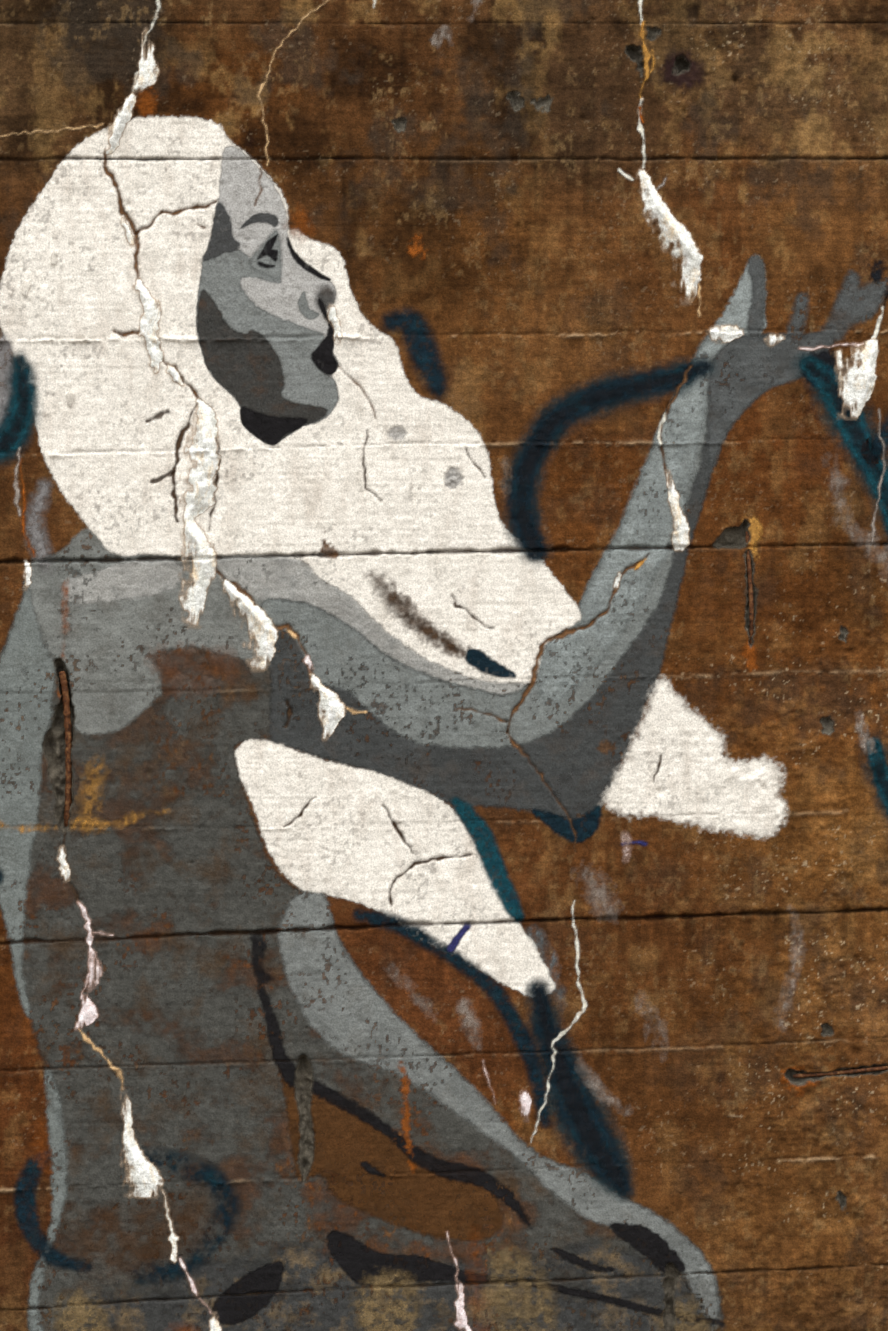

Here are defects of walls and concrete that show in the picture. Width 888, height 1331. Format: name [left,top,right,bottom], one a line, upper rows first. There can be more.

crack [5,123,217,278]
crack [133,0,160,92]
crack [255,5,321,204]
crack [637,0,655,168]
crack [459,560,644,851]
crack [57,839,123,1087]
crack [533,901,587,1135]
crack [446,1232,472,1331]